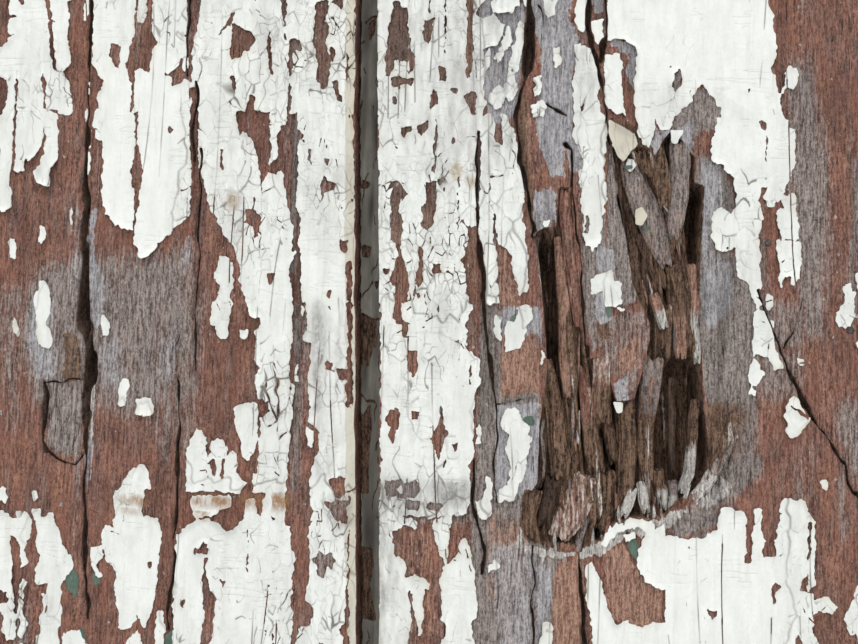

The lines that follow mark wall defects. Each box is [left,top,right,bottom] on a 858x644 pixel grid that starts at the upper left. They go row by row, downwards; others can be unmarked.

peeling [0,0,73,212]
peeling [8,238,17,259]
peeling [33,280,53,349]
crack [42,0,98,619]
peeling [83,0,534,644]
crack [471,133,522,575]
crack [563,143,593,383]
spalling [475,0,838,644]
crack [757,290,858,498]
peeling [835,273,858,329]
peeling [0,486,86,644]
peeling [843,585,858,638]